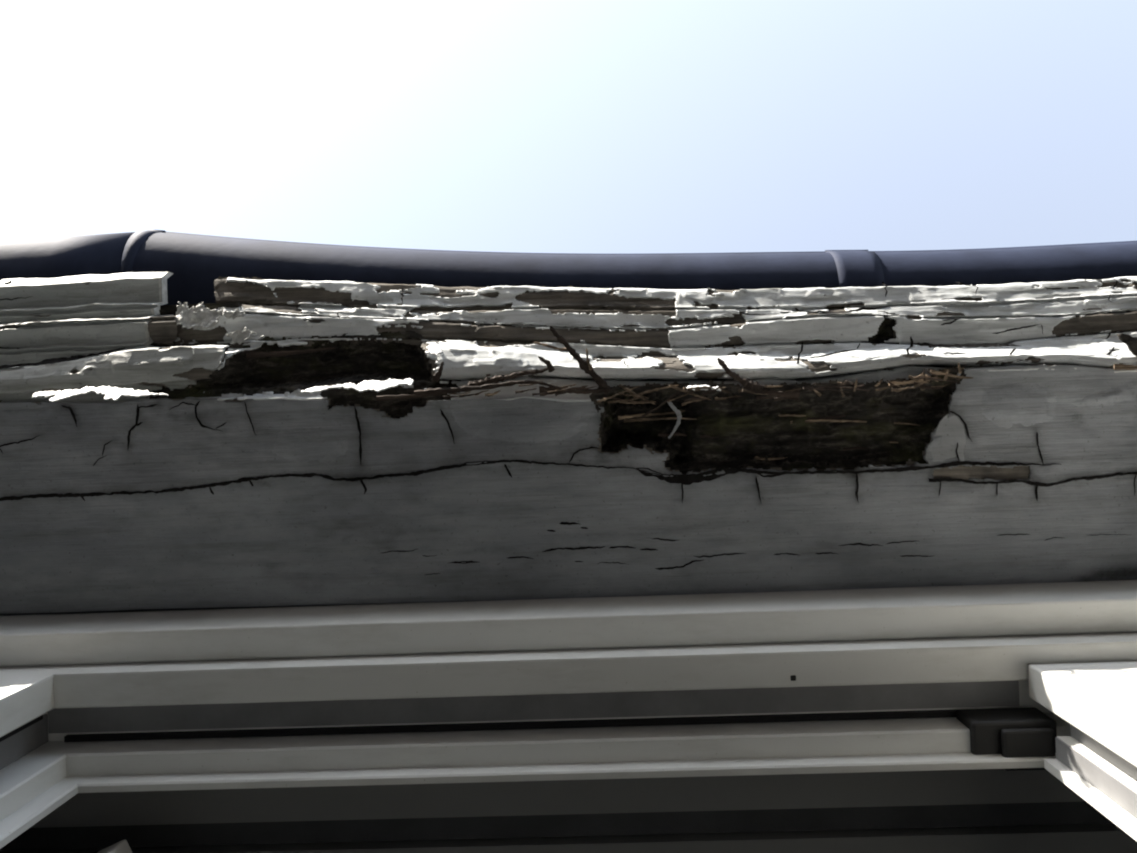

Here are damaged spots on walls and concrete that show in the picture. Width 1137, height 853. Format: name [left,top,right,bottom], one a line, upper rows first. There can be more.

peeling [214,276,358,315]
peeling [144,314,227,346]
peeling [374,286,746,363]
peeling [1045,306,1137,339]
peeling [969,357,1044,367]
peeling [32,386,168,402]
peeling [667,402,682,439]
crack [0,401,1137,503]
peeling [927,414,1030,482]